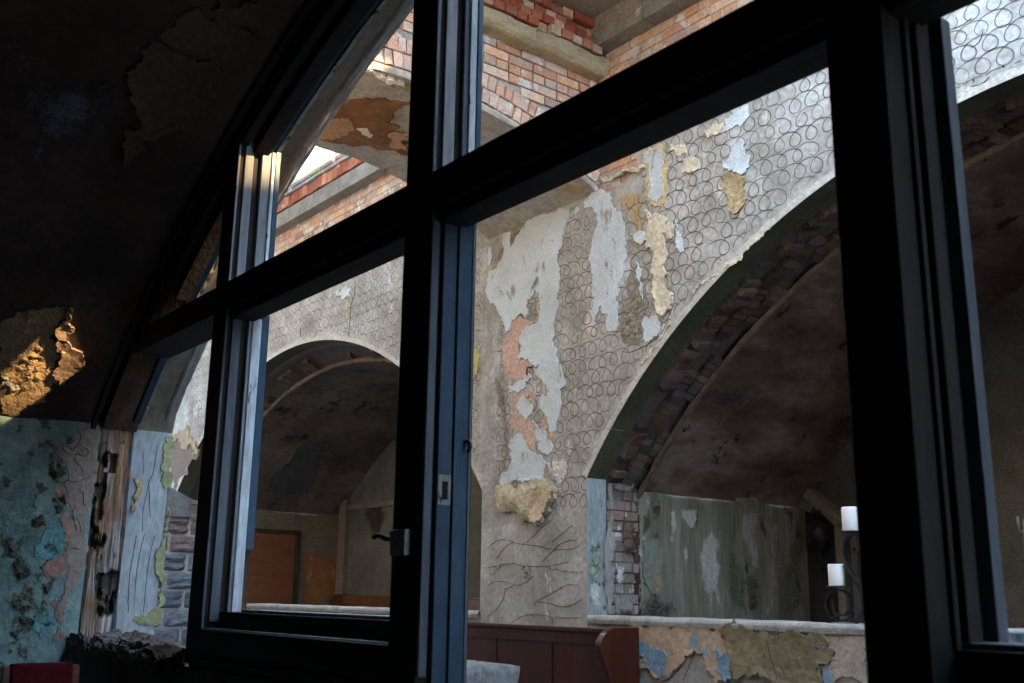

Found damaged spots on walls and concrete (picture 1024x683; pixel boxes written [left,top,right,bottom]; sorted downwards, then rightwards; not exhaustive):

spalling [320,66,410,156]
peeling [703,104,751,214]
spalling [692,229,770,295]
peeling [485,143,701,485]
spalling [0,306,85,417]
spalling [160,425,200,489]
peeling [31,485,76,579]
peeling [133,506,171,626]
leakage [640,595,685,617]
leakage [644,492,697,542]
leakage [684,510,809,617]
spalling [630,619,866,683]